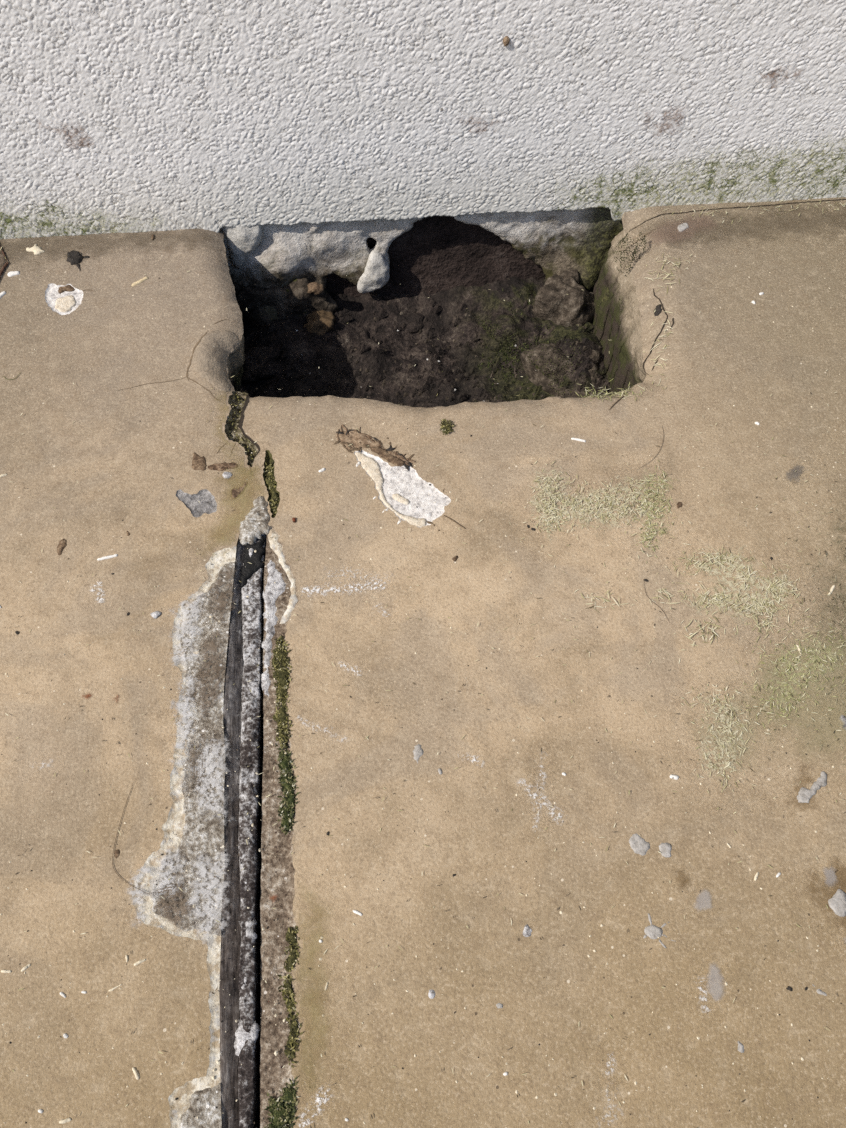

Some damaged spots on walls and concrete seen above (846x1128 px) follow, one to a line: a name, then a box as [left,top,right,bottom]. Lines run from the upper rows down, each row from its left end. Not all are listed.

crack [117,319,280,518]
spalling [227,335,246,401]
peeling [223,223,263,268]
peeling [357,250,390,294]
spalling [591,230,646,396]
spalling [176,489,217,518]
spalling [130,545,237,1128]
spalling [260,526,300,1128]